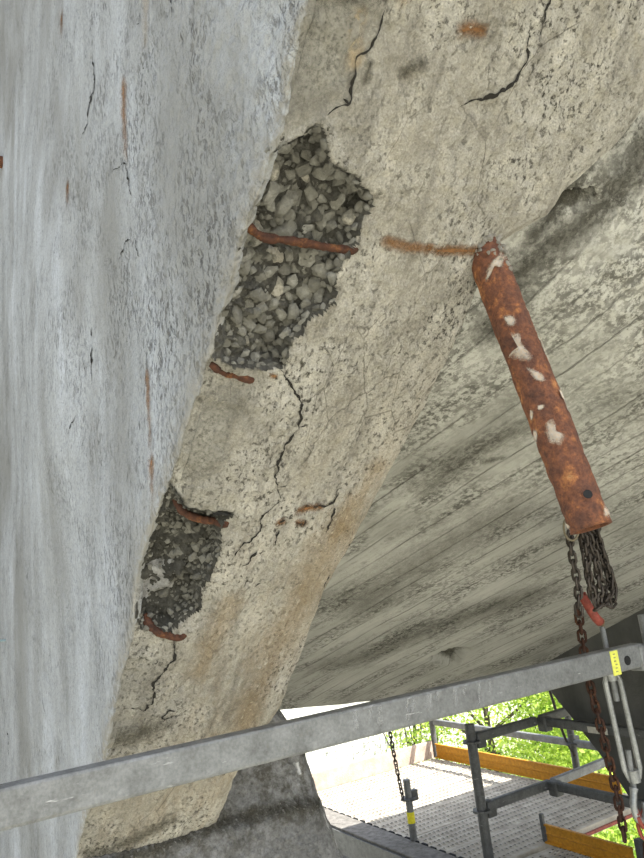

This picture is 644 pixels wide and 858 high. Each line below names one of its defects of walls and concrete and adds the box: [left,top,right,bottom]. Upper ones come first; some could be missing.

crack [80,61,95,139]
crack [328,7,386,115]
corrosion [459,23,486,37]
crack [459,0,551,108]
spalling [211,123,375,371]
corrosion [383,237,478,256]
crack [234,370,339,566]
spalling [135,484,234,634]
crack [131,643,177,720]